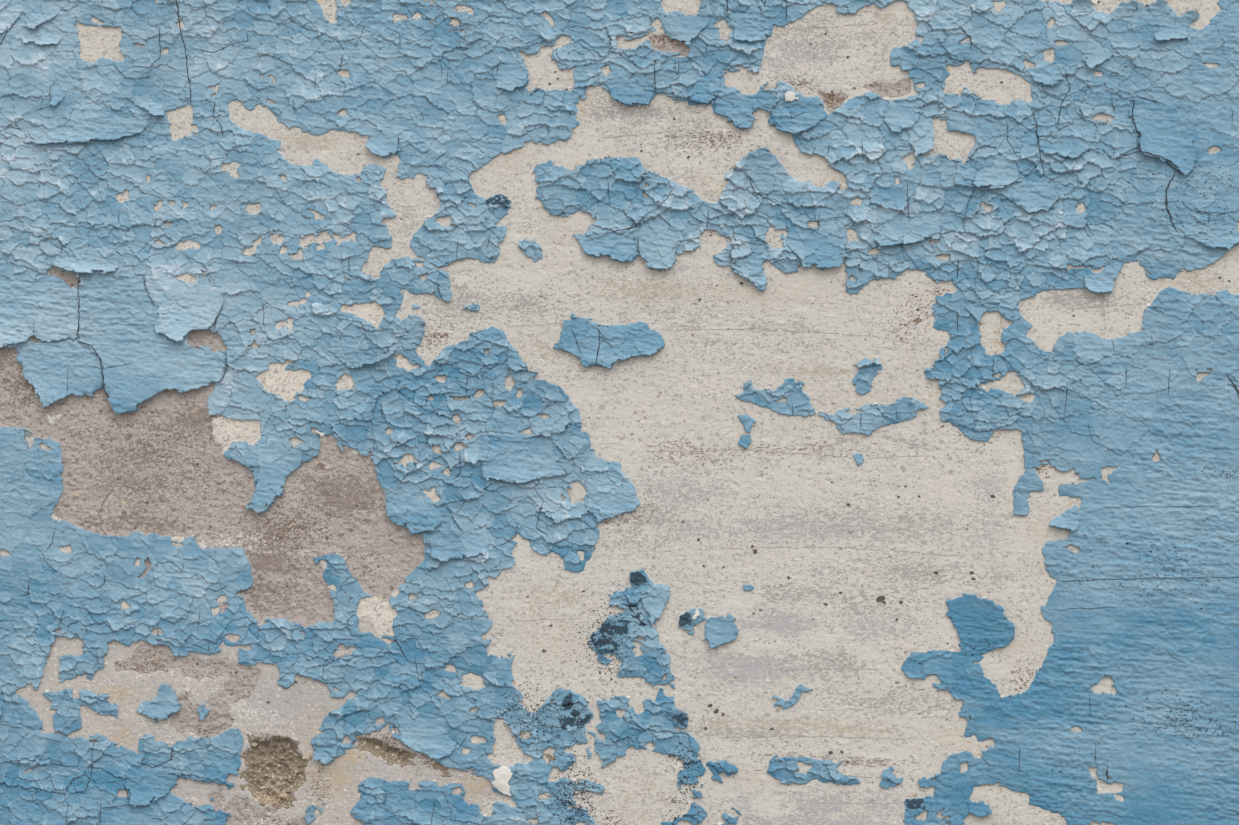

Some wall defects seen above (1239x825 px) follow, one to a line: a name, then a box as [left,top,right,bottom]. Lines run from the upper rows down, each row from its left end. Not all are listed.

crack [136,0,248,139]
peeling [221,161,241,179]
crack [965,70,1070,223]
crack [1111,93,1224,231]
crack [61,242,130,397]
flaking render [0,252,489,645]
peeling [227,0,1117,825]
crack [1108,506,1239,542]
flaking render [115,643,261,740]
crack [55,743,173,825]
peeling [96,764,186,825]
peeling [1089,767,1125,802]